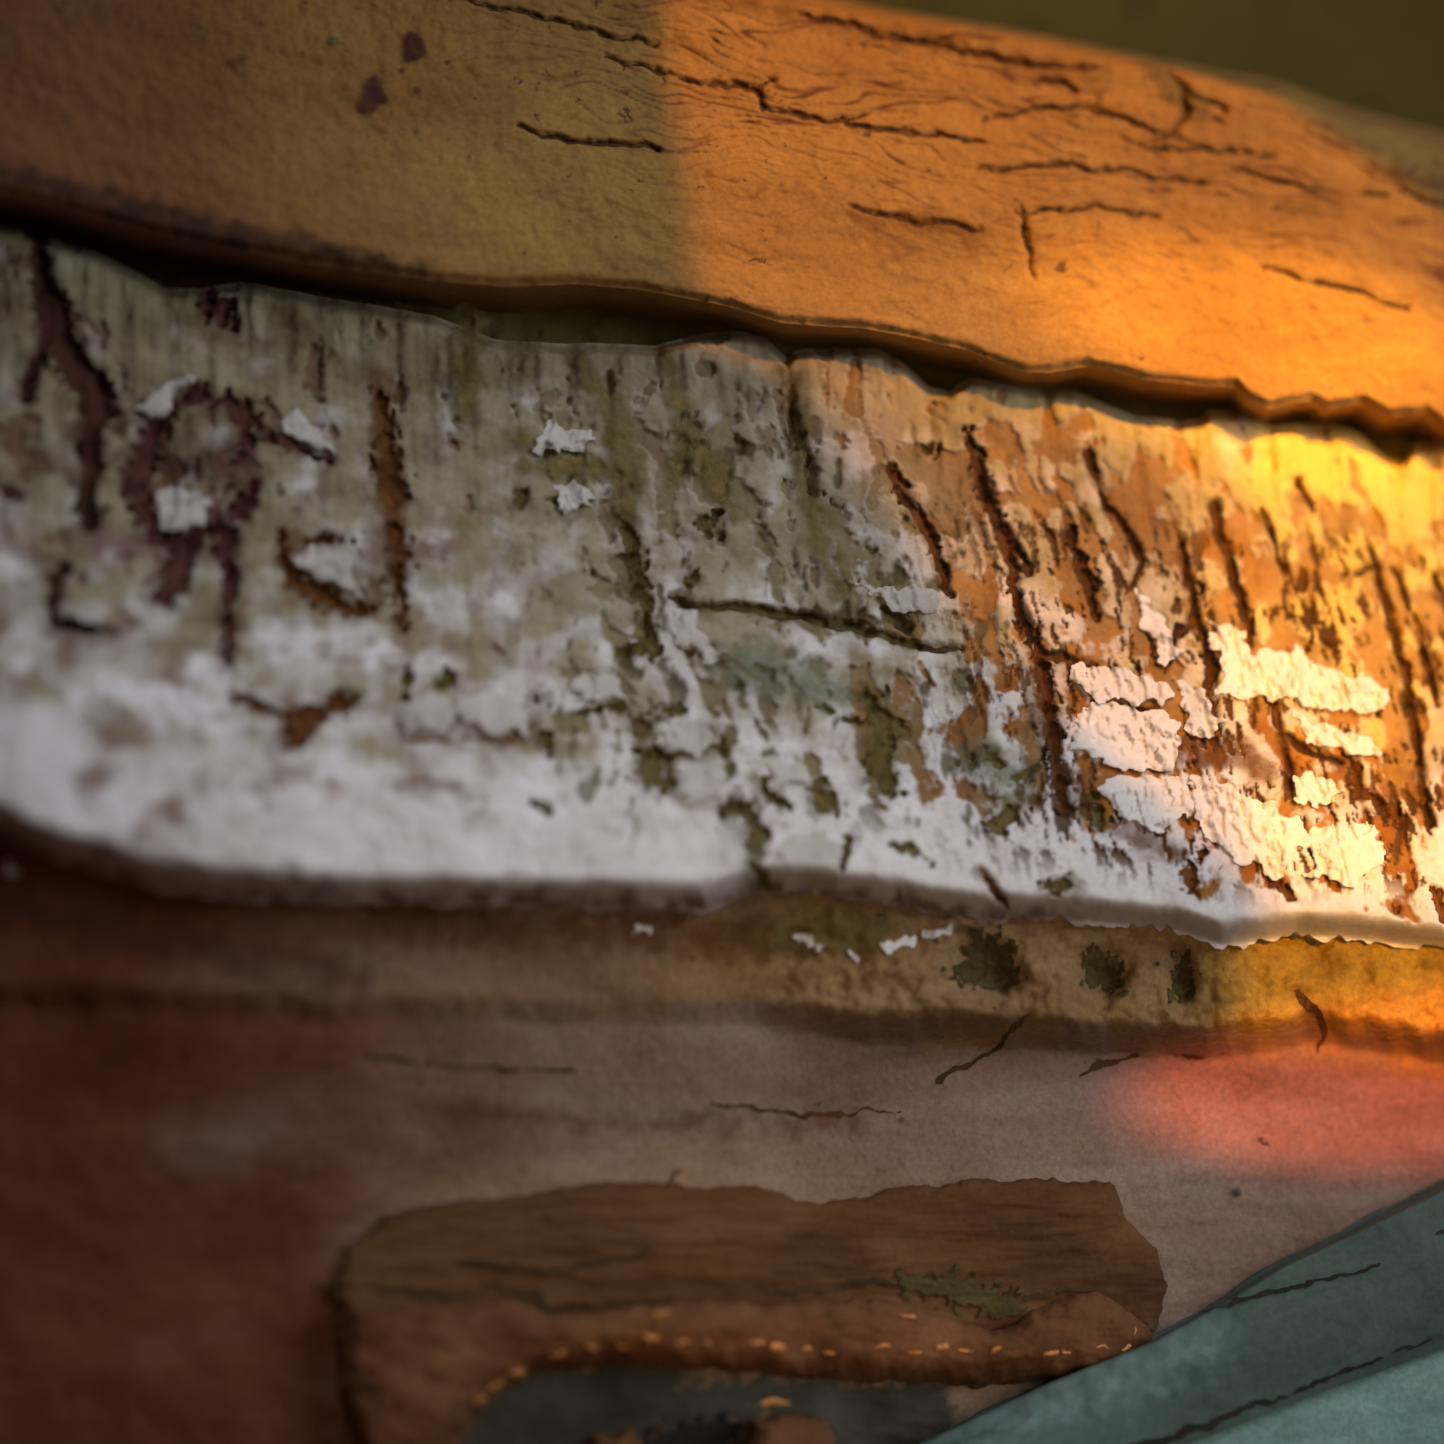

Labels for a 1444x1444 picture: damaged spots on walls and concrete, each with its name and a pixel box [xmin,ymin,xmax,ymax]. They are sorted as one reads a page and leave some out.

crack [467,0,1444,274]
crack [1261,268,1408,312]
crack [20,220,119,636]
spalling [117,375,336,666]
spalling [274,386,419,633]
peeling [395,664,554,759]
peeling [570,513,853,894]
corrosion [1119,822,1182,860]
corrosion [1177,735,1281,778]
peeling [1069,588,1402,902]
crack [1131,1338,1432,1444]
crack [1199,1263,1381,1314]